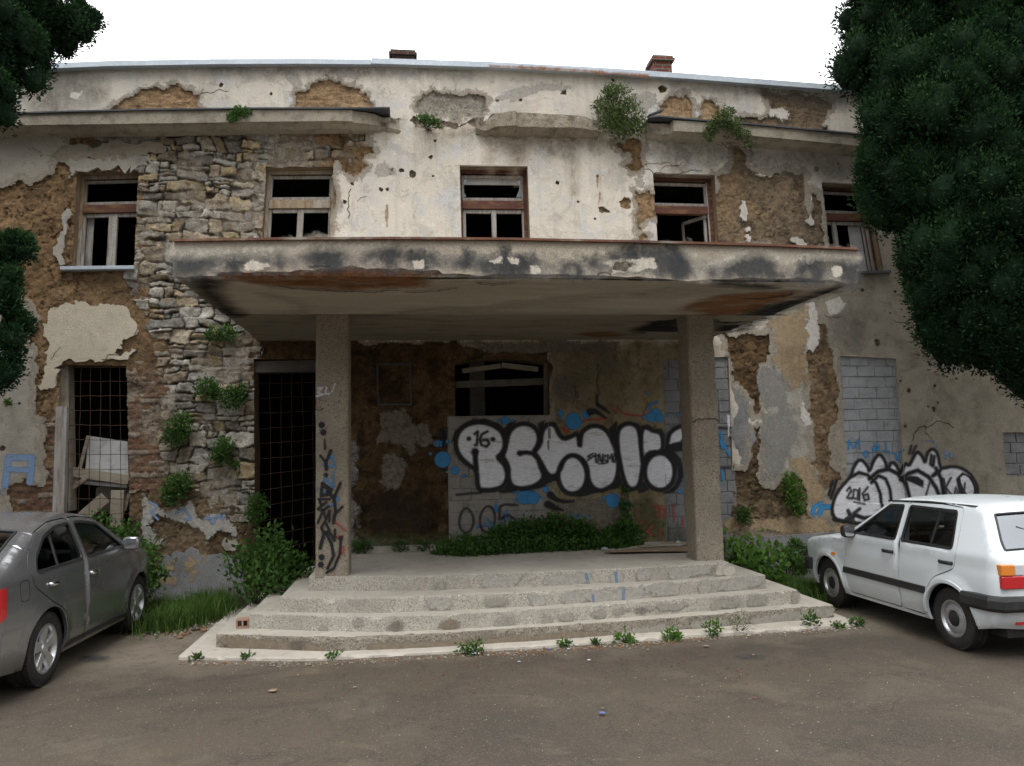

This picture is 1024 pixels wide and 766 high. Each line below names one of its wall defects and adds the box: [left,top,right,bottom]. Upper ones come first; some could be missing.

spalling [111,83,200,109]
spalling [294,78,374,107]
spalling [410,82,572,142]
spalling [594,138,656,240]
spalling [710,147,825,246]
rust [224,274,426,290]
damp [170,240,860,336]
rust [686,291,792,315]
spalling [0,133,441,606]
spalling [351,340,554,547]
spalling [723,296,847,536]
crack [912,420,954,443]